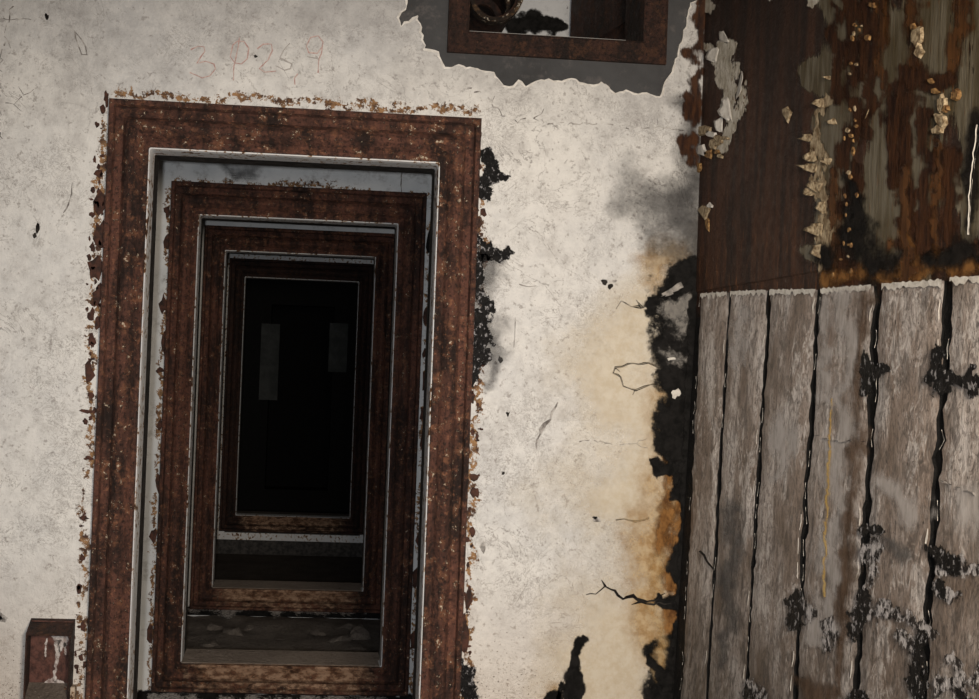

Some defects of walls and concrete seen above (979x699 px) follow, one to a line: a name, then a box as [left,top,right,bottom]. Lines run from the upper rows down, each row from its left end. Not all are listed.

spalling [396,0,715,98]
corrosion [114,86,481,116]
peeling [697,0,979,310]
crack [613,362,658,395]
damp [924,344,979,399]
corrosion [74,277,101,699]
corrosion [464,366,485,667]
damp [646,288,697,693]
damp [783,292,910,699]
spalling [462,586,473,655]
crack [586,581,671,606]
damp [924,543,962,600]